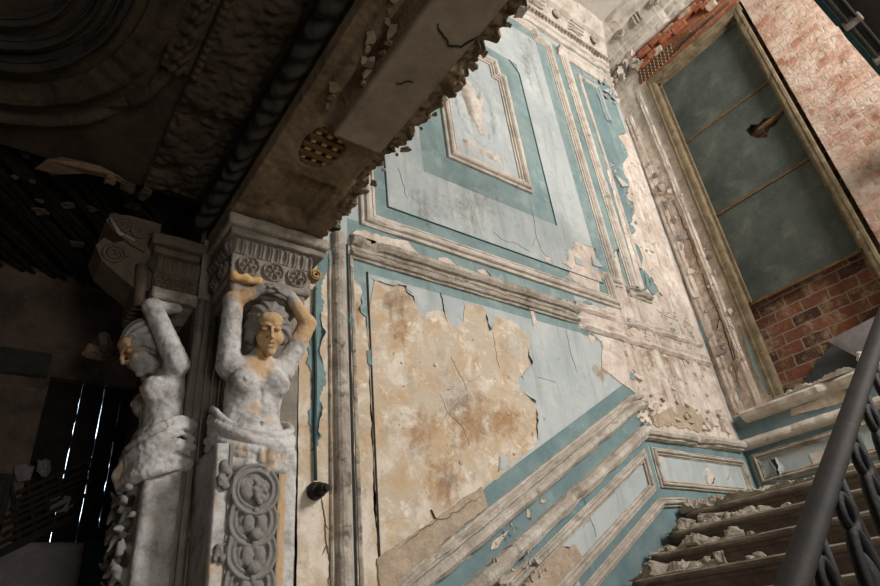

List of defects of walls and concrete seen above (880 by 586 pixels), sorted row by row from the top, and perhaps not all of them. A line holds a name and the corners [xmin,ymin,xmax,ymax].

spalling [360,0,399,86]
crack [438,23,478,48]
peeling [466,49,489,72]
peeling [505,6,528,28]
peeling [35,157,153,201]
peeling [336,180,377,228]
peeling [573,0,771,440]
crack [673,201,741,389]
peeling [296,248,335,586]
peeling [347,276,545,586]